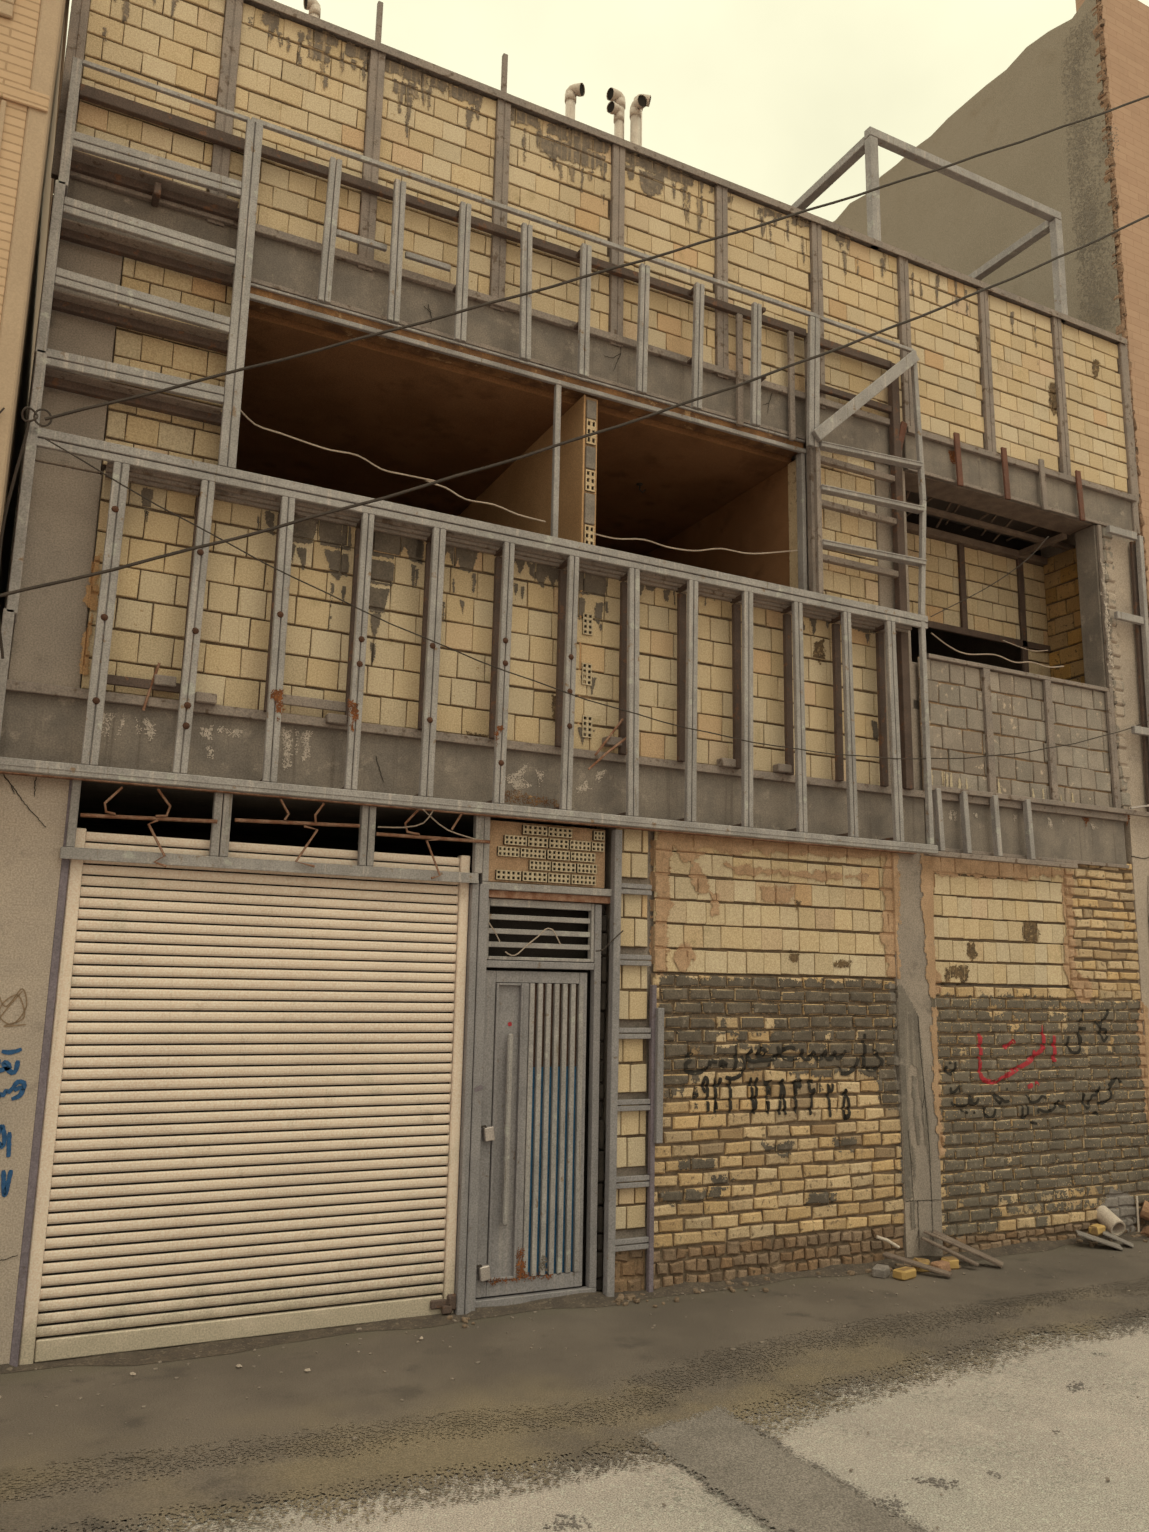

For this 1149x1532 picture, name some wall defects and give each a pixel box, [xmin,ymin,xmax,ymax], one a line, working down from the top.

leakage [102,0,131,42]
leakage [248,11,483,138]
leakage [511,106,733,234]
leakage [757,207,810,261]
leakage [911,273,969,322]
leakage [291,515,352,631]
leakage [369,532,424,662]
leakage [442,546,479,621]
spalling [1021,920,1041,944]
spalling [834,959,852,968]
spalling [941,941,978,987]
rust [489,1247,553,1286]